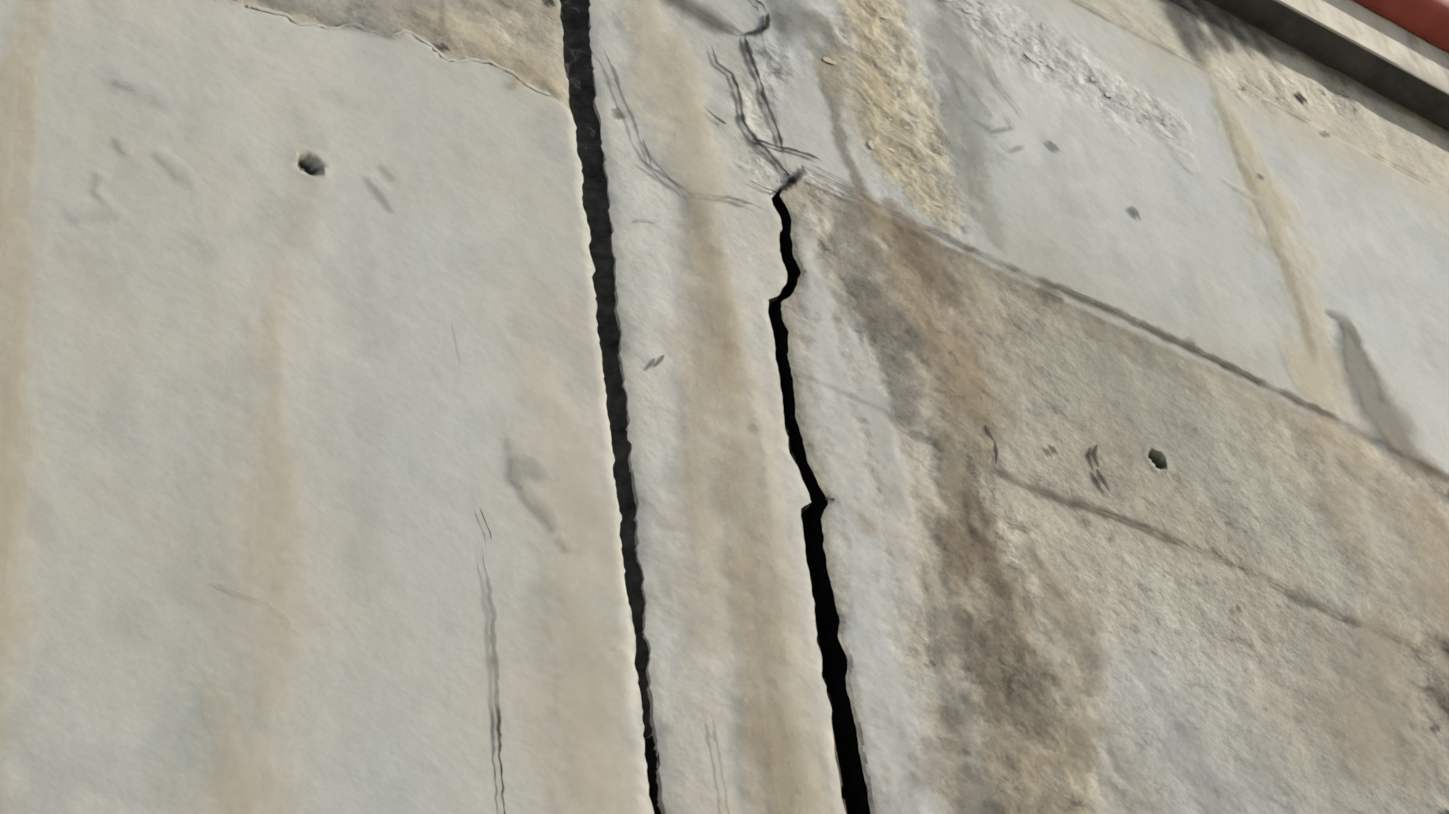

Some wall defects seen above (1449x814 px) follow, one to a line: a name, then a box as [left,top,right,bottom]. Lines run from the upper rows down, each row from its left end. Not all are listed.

peeling [823,0,950,225]
damp [1164,0,1278,63]
crack [605,0,884,814]
crack [496,703,506,814]